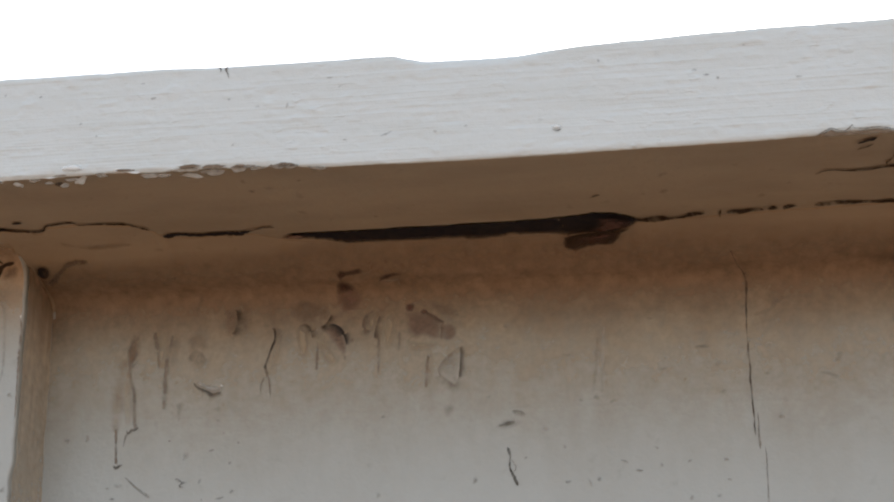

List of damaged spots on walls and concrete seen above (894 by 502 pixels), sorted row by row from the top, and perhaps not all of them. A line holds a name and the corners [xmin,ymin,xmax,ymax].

peeling [0,162,298,188]
crack [821,137,894,172]
crack [0,199,894,250]
damp [0,237,894,498]
crack [731,252,759,432]